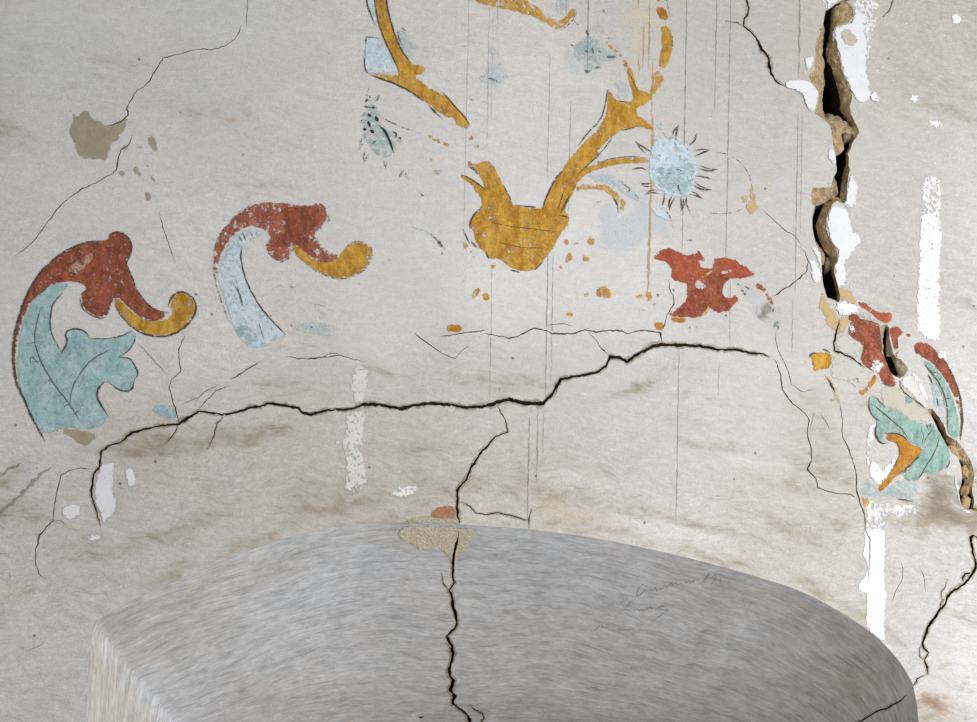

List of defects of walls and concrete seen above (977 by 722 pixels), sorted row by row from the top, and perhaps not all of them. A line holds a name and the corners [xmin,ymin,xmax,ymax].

crack [15,0,248,256]
peeling [810,260,821,282]
peeling [819,287,858,334]
crack [765,0,977,722]
crack [35,282,871,722]